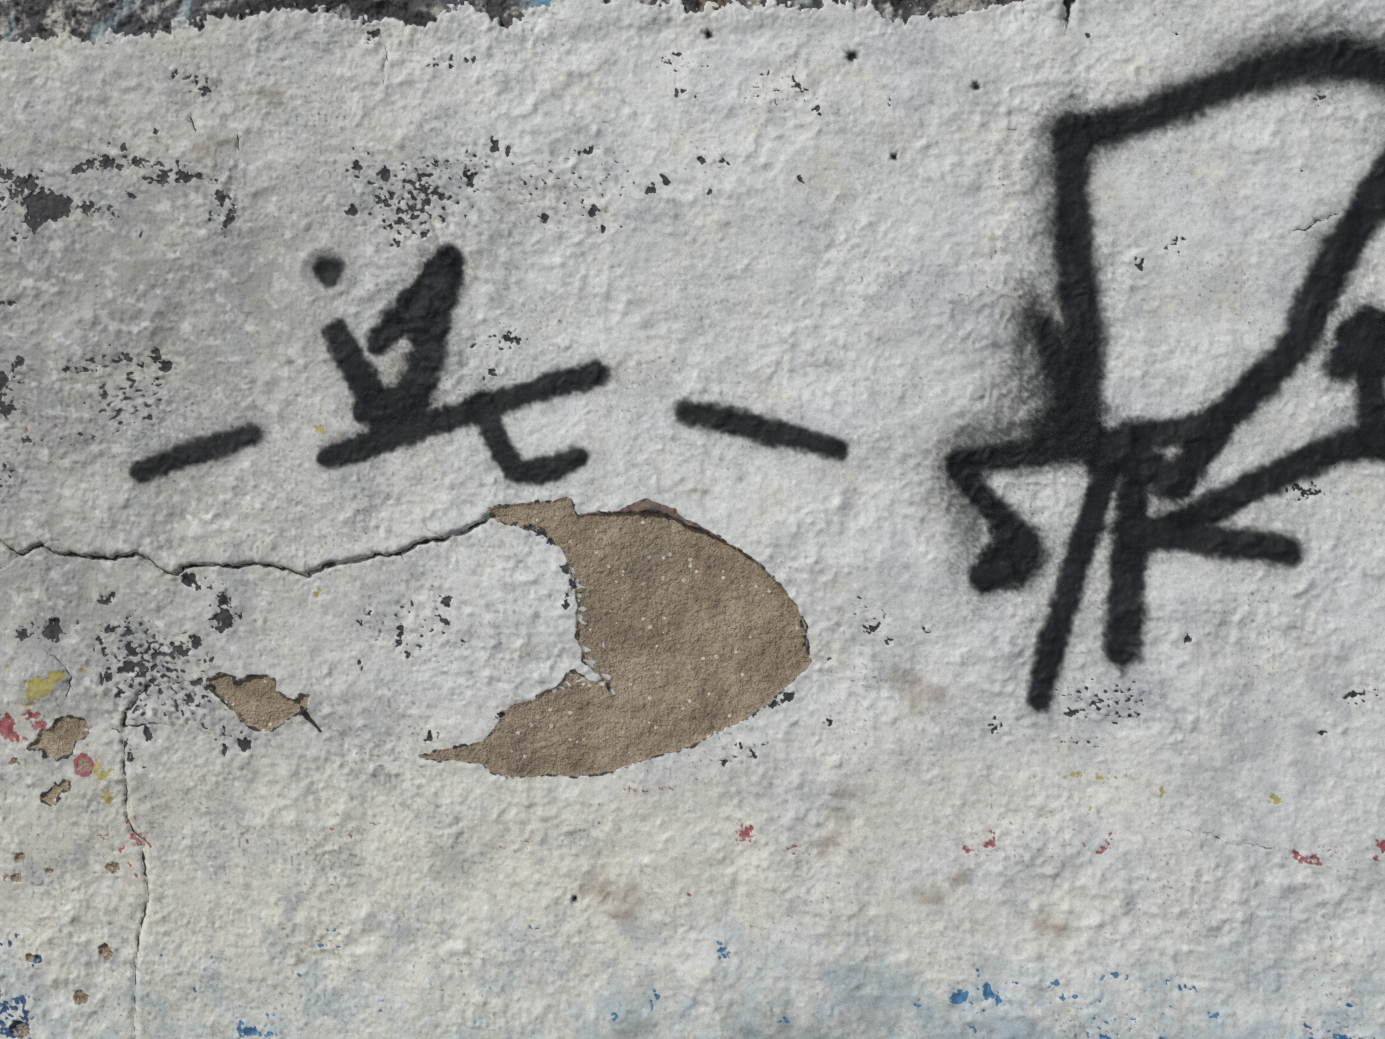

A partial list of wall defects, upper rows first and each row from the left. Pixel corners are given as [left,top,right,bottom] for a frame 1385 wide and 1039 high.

peeling [171,69,212,97]
crack [1,516,486,585]
peeling [356,595,453,663]
flaking render [412,497,831,779]
peeling [854,596,894,645]
flaking render [0,572,321,806]
crack [112,680,199,1002]